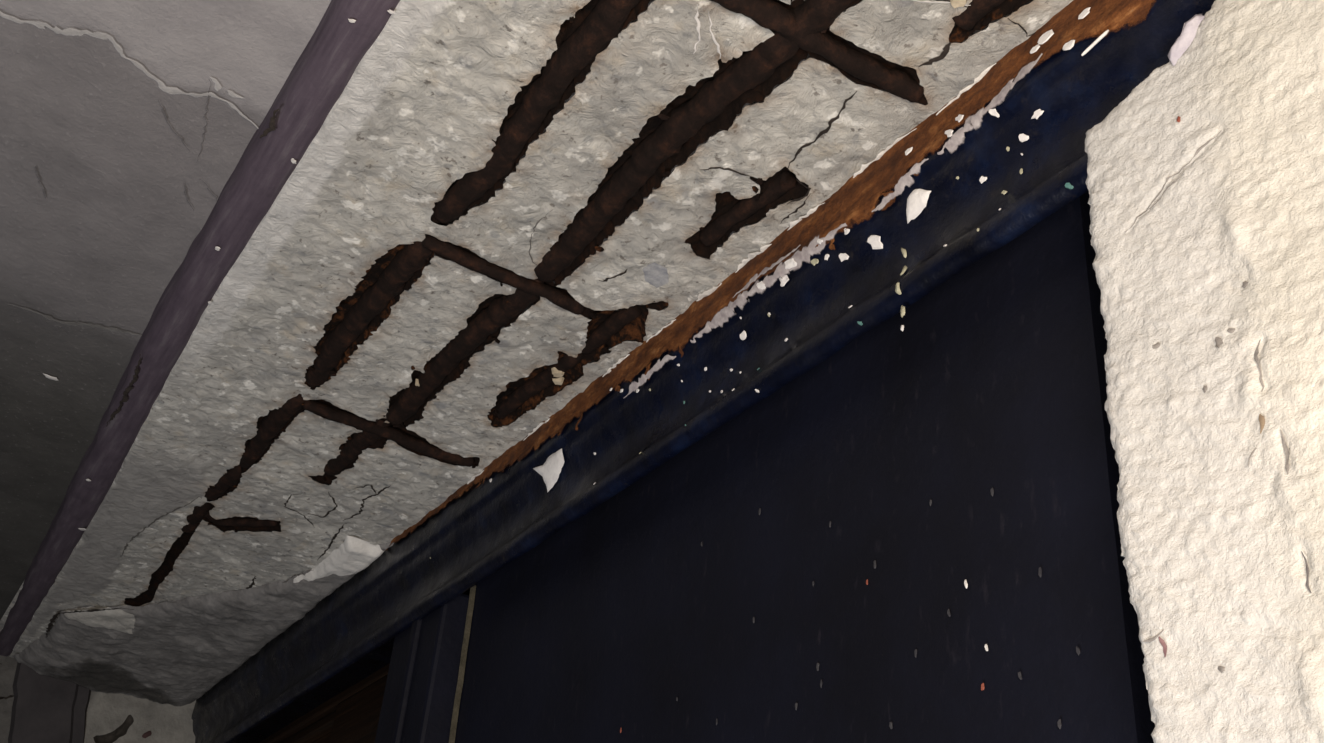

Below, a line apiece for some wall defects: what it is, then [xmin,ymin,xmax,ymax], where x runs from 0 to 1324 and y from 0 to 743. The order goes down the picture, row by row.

spalling [949,0,1031,43]
crack [158,80,217,210]
peeling [821,28,1075,223]
spalling [124,0,884,606]
corrosion [386,0,1156,550]
crack [121,496,200,556]
crack [246,485,391,589]